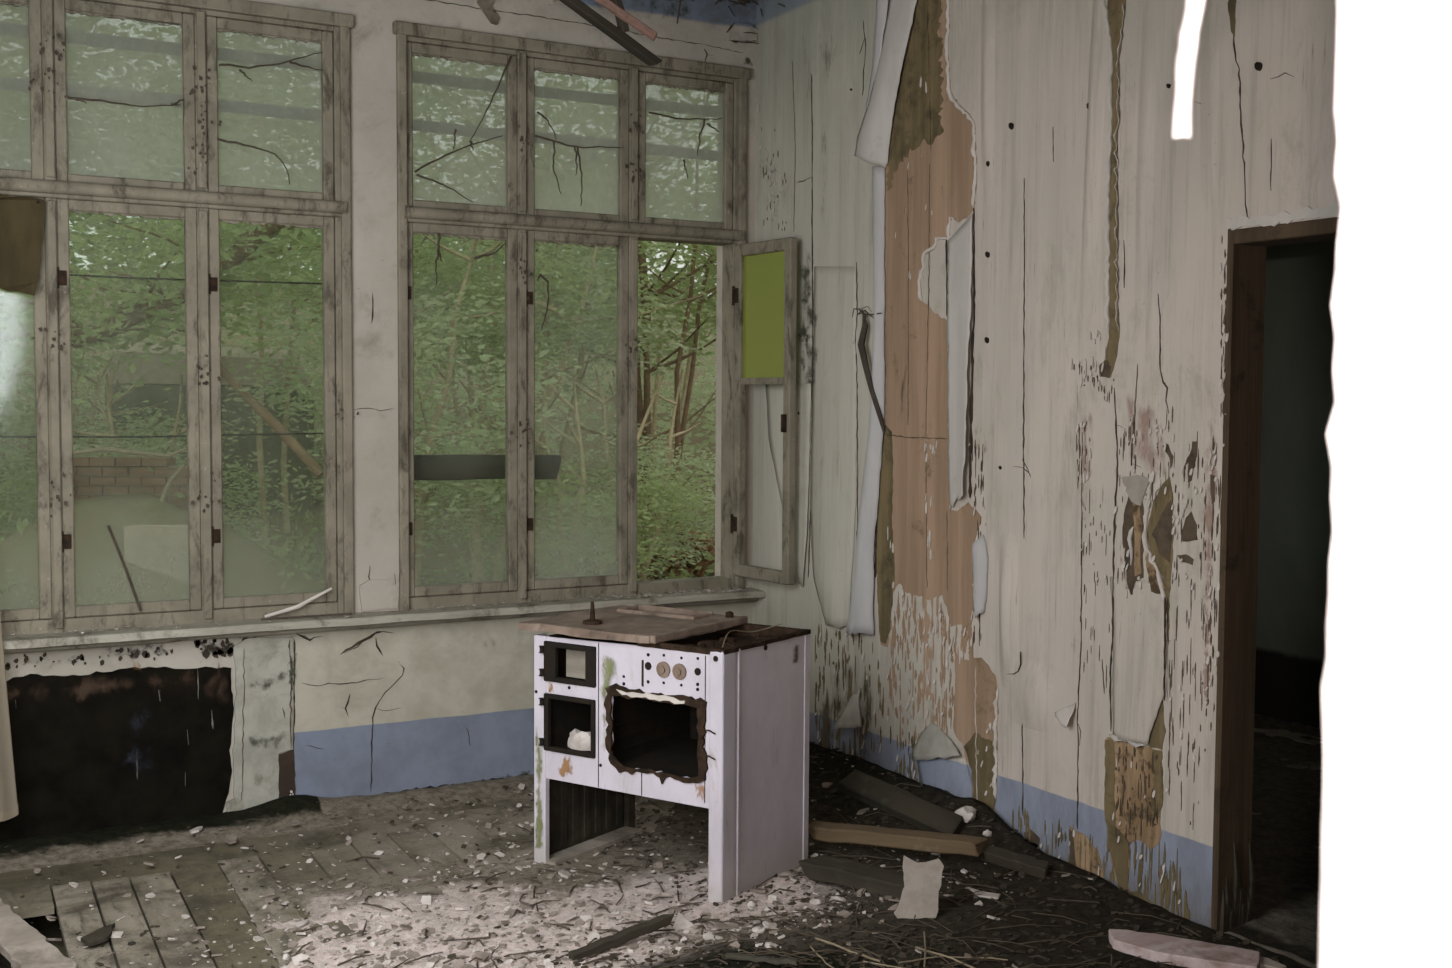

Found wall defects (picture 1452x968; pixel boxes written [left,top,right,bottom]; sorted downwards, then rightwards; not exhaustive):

peeling [765,0,1190,920]
peeling [1076,237,1229,825]
flaking render [0,667,234,841]
flaking render [278,750,296,798]
crack [293,631,405,788]